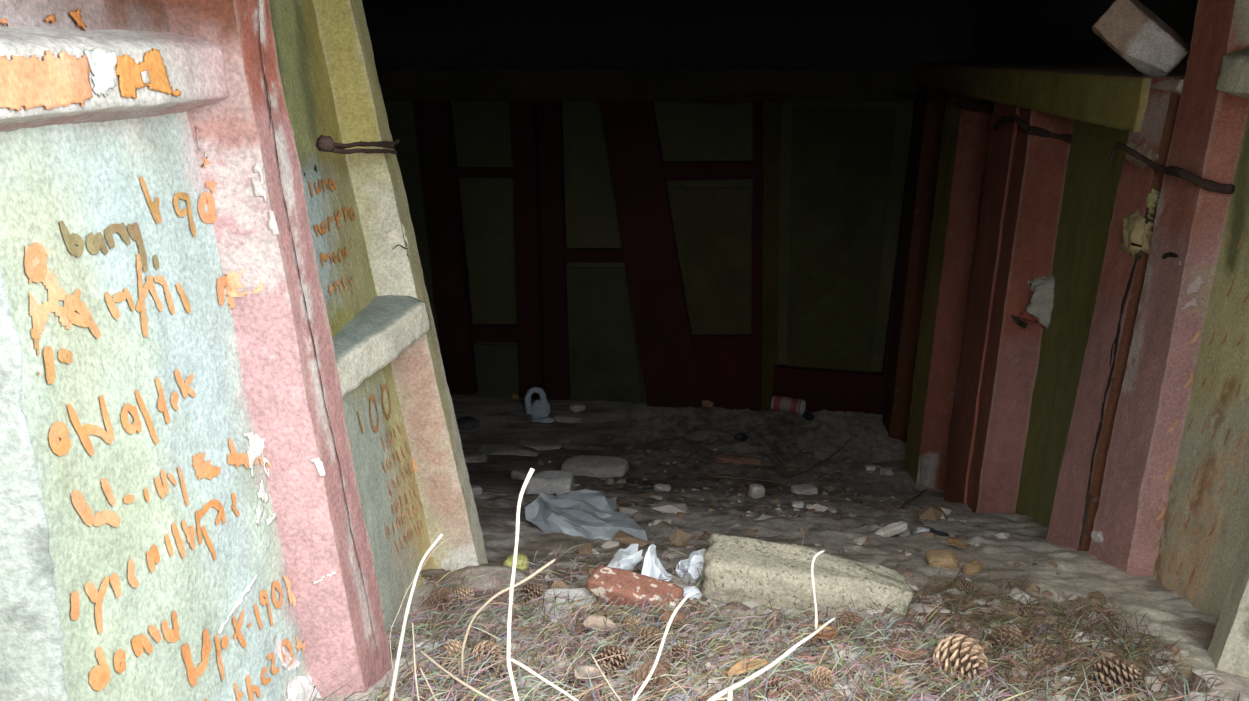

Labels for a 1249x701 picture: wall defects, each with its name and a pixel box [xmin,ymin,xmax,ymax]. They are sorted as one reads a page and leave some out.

peeling [0,48,182,111]
leakage [1228,126,1249,268]
crack [1079,203,1156,546]